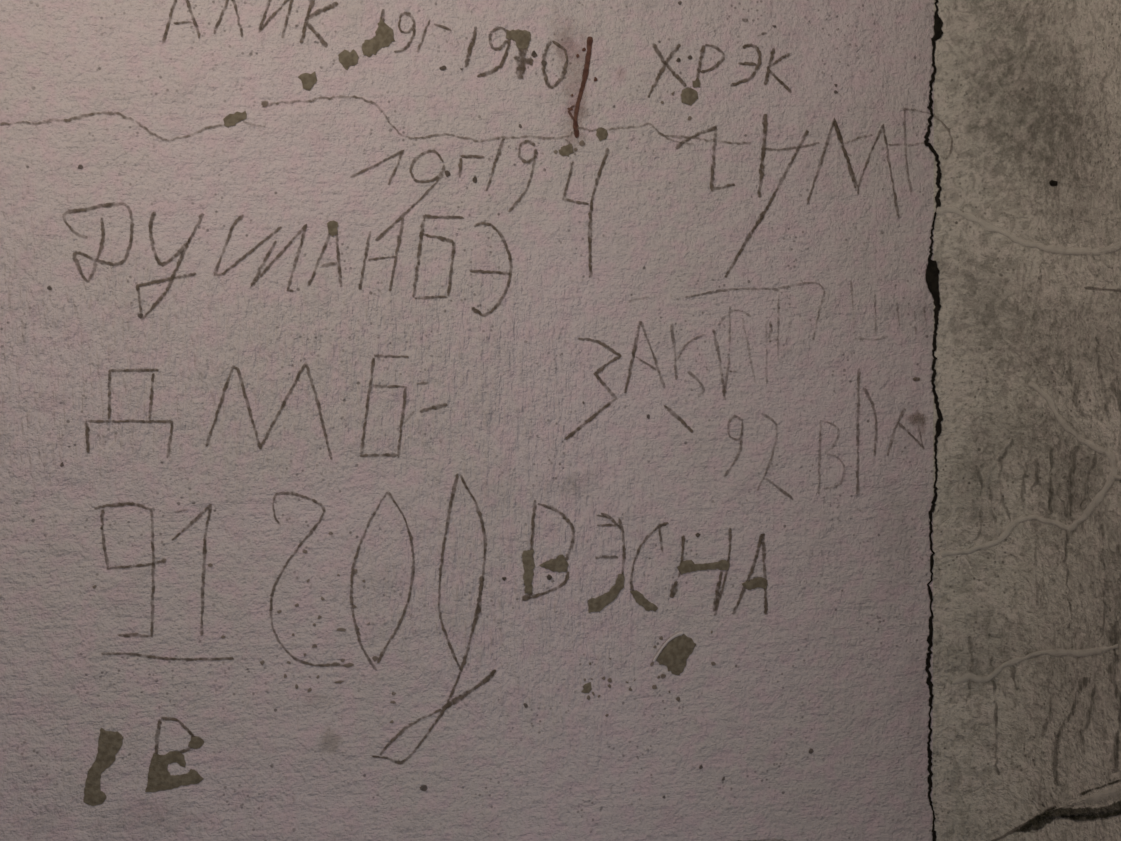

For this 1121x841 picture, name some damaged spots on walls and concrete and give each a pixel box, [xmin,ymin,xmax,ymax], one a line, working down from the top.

crack [1,112,221,140]
crack [263,96,629,145]
crack [661,133,746,145]
crack [855,0,943,841]